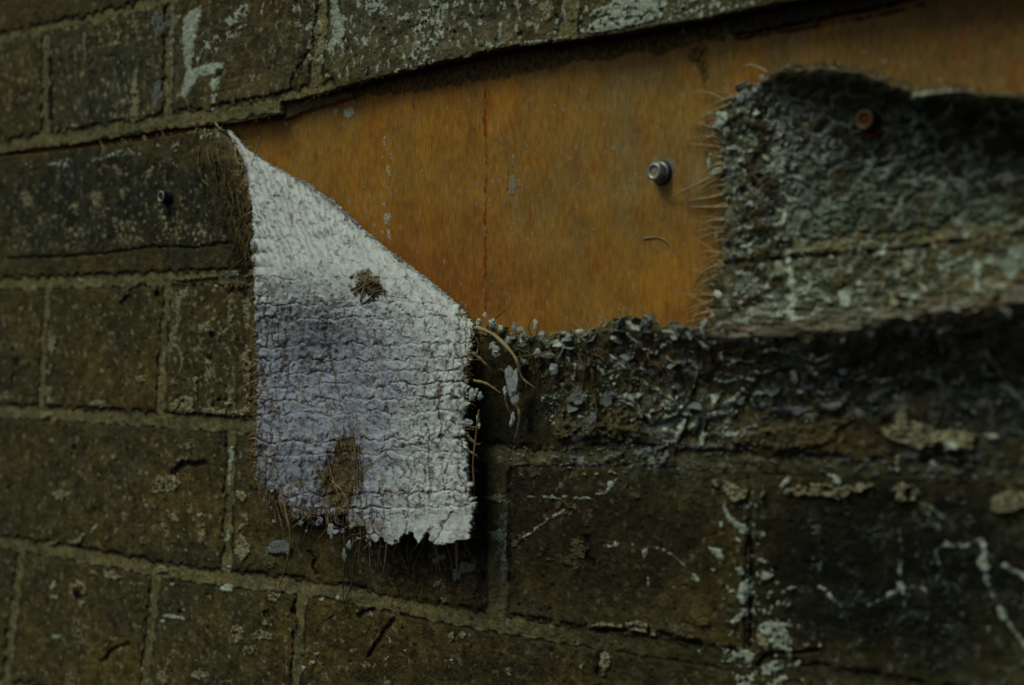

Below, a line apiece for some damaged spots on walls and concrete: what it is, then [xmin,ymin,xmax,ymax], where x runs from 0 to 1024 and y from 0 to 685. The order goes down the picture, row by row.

peeling [0,0,760,141]
spalling [466,78,1024,685]
crack [171,460,206,475]
peeling [272,509,344,535]